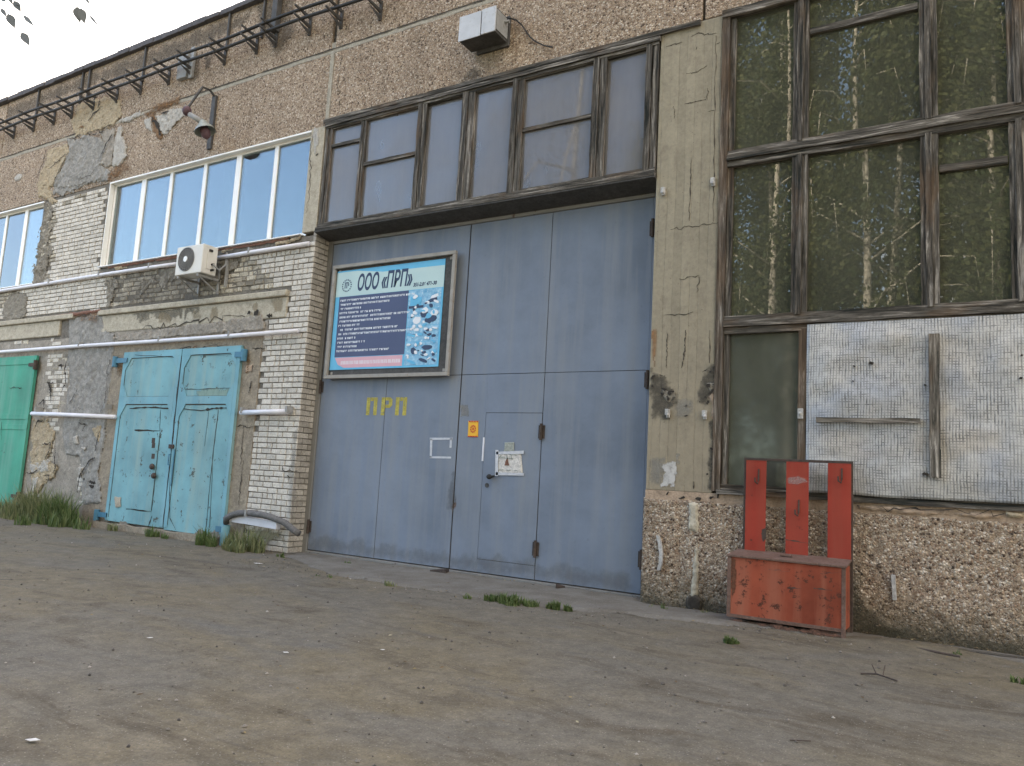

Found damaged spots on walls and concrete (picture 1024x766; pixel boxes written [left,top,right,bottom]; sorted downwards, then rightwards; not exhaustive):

crack [666,32,720,230]
spalling [2,96,186,321]
crack [666,275,711,368]
spalling [650,366,715,419]
spalling [26,418,58,496]
spalling [73,422,101,492]